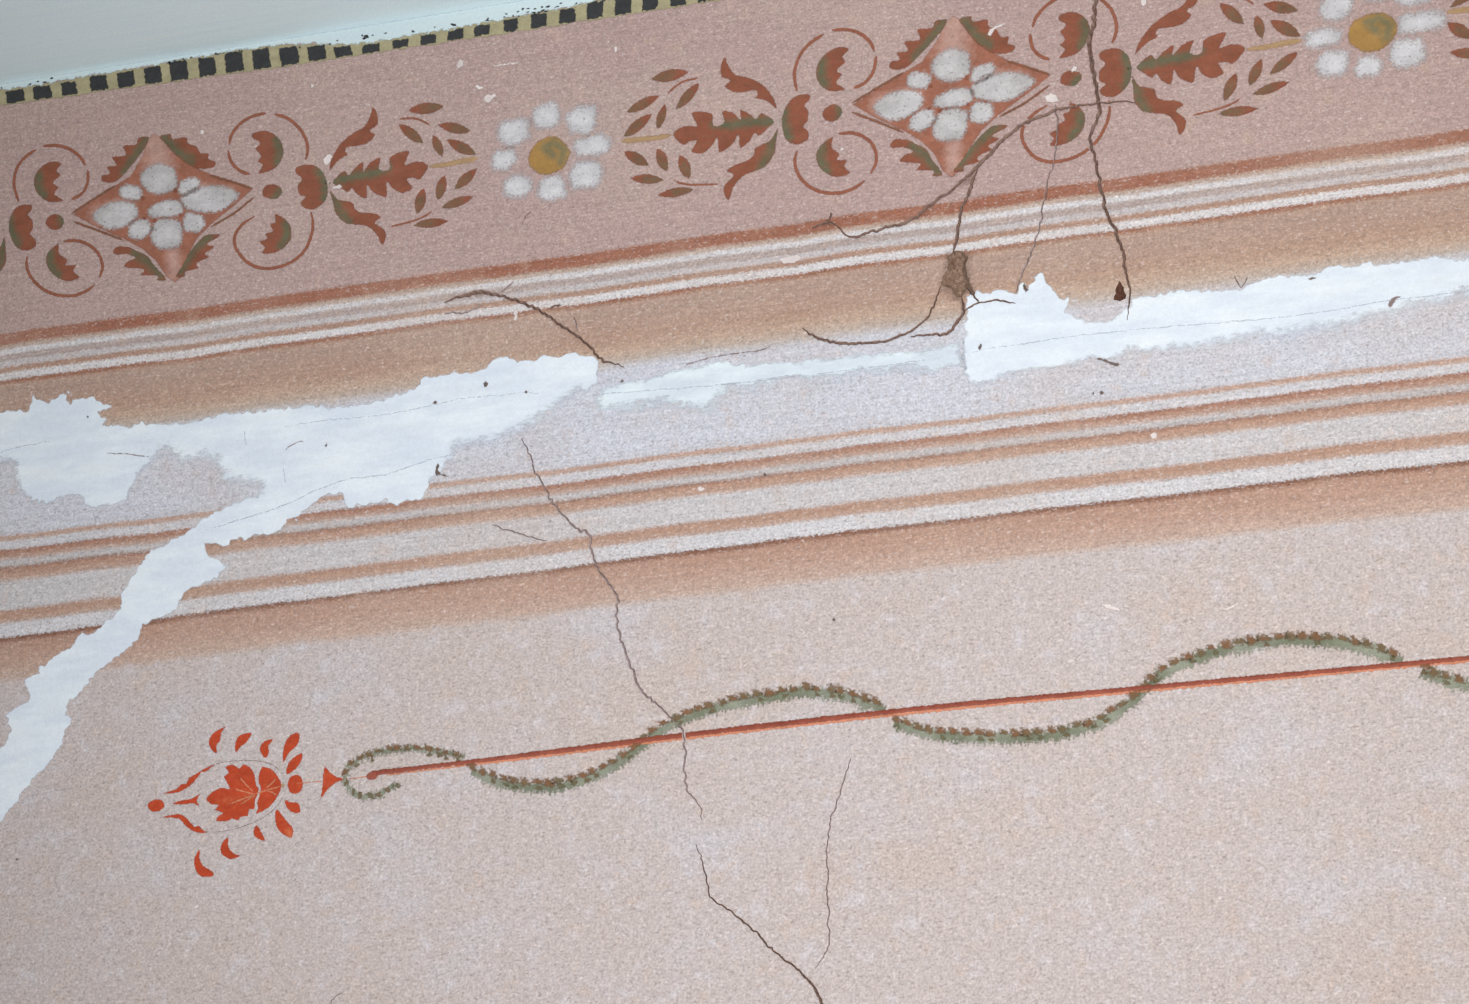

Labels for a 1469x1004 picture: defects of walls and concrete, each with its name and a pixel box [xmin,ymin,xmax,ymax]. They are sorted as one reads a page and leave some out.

crack [444,0,1464,394]
flaking render [1114,281,1126,301]
crack [493,440,851,1004]